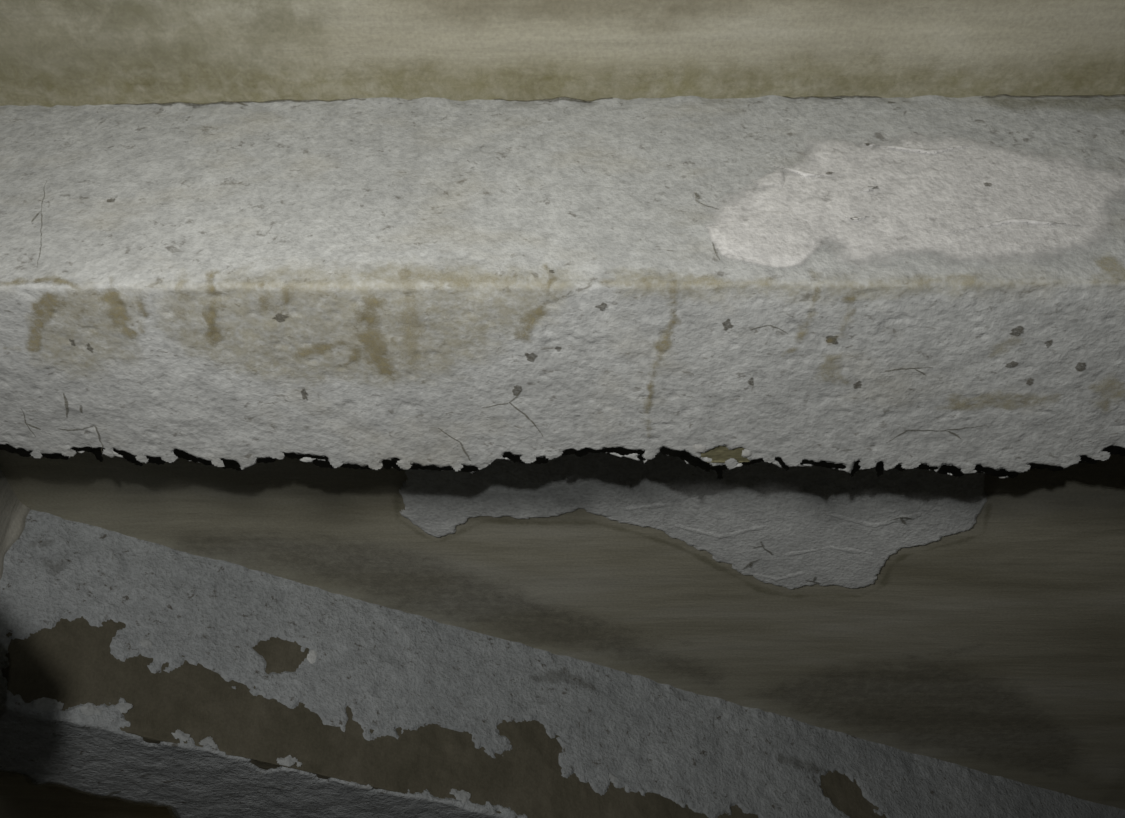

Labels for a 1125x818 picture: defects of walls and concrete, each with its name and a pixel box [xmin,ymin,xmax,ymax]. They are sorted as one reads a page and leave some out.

crack [483,393,543,437]
crack [887,426,978,443]
flaking render [0,444,1125,479]
spalling [2,616,759,818]
spalling [820,770,887,818]